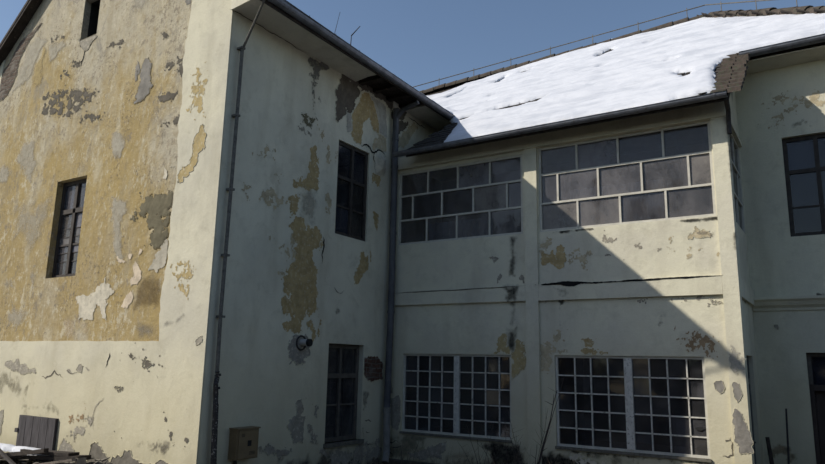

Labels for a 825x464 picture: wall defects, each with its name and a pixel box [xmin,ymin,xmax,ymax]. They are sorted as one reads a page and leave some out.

flaking render [78,34,98,51]
flaking render [42,58,105,123]
flaking render [335,74,409,145]
peeling [241,113,338,342]
peeling [539,237,593,270]
crack [403,285,515,293]
crack [541,275,721,286]
flaking render [363,356,383,382]
flaking render [713,346,754,455]
flaking render [66,412,170,464]